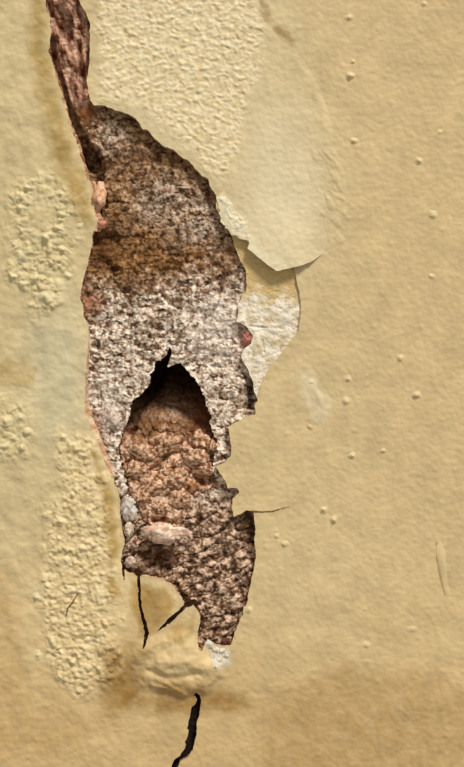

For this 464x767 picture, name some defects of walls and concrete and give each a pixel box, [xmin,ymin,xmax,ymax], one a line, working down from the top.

flaking render [26,0,334,704]
crack [121,556,197,649]
crack [171,693,201,767]
leakage [0,446,464,767]